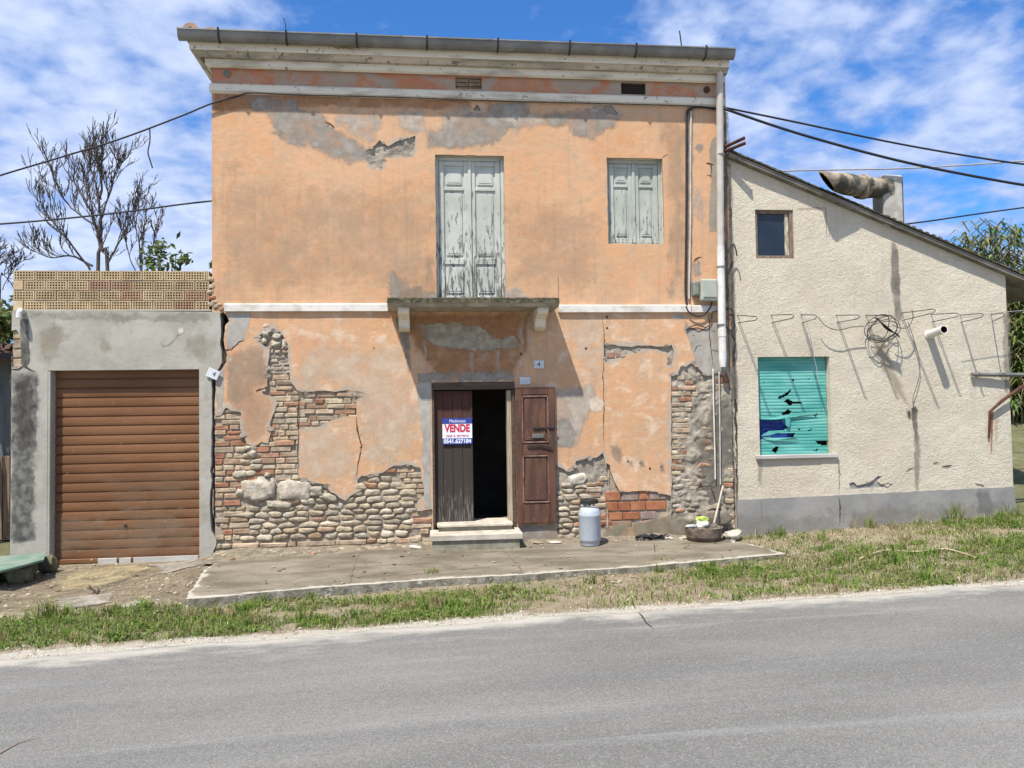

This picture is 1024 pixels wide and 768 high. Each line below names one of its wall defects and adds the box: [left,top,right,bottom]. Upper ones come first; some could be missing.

peeling [249,96,620,170]
peeling [418,322,522,355]
crack [599,320,607,446]
damp [10,319,38,542]
flaking render [214,324,436,551]
crack [356,419,364,470]
flaking render [556,343,735,539]
flaking render [849,476,893,489]
damp [907,407,919,485]